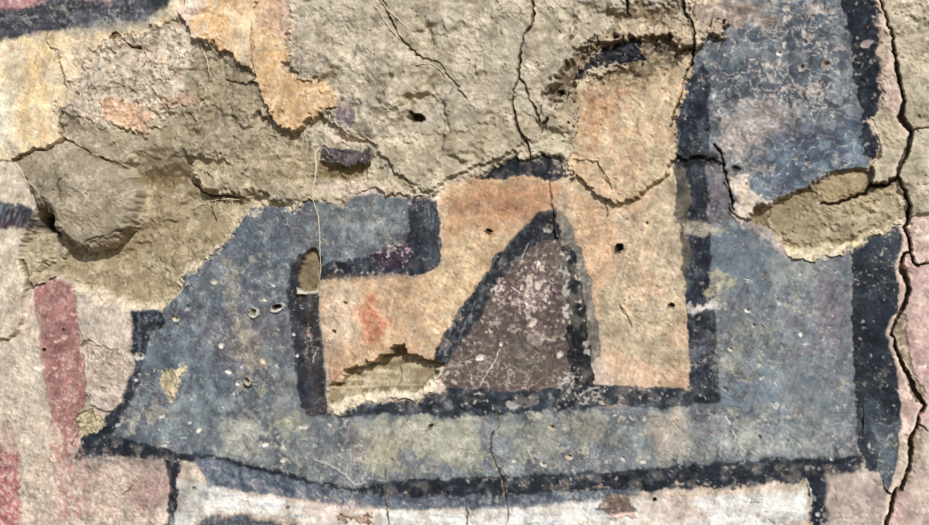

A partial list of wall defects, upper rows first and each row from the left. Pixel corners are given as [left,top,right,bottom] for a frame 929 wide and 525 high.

crack [46,30,67,89]
crack [109,31,142,50]
crack [379,0,468,101]
crack [670,0,697,129]
crack [10,112,132,171]
spalling [23,0,731,312]
crack [511,0,560,238]
spalling [750,0,929,263]
crack [820,0,929,525]
spalling [76,409,107,437]
spalling [159,366,187,403]
spalling [327,345,445,416]